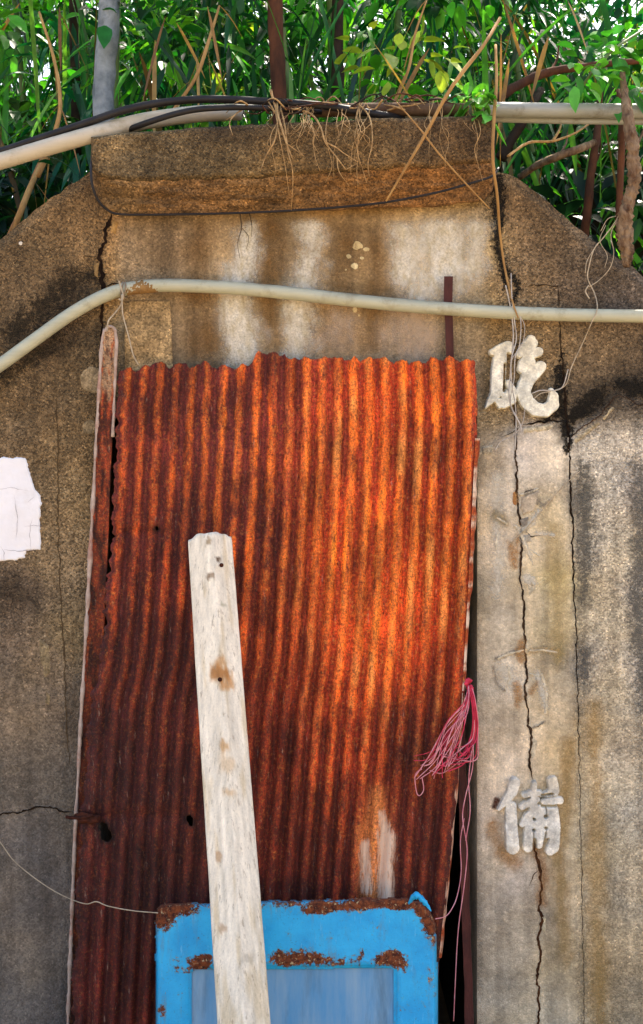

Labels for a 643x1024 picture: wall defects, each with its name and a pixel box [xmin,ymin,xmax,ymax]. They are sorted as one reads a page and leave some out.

crack [88,214,119,341]
crack [502,284,643,1024]
leakage [541,349,643,604]
leakage [622,459,643,715]
crack [0,806,71,815]